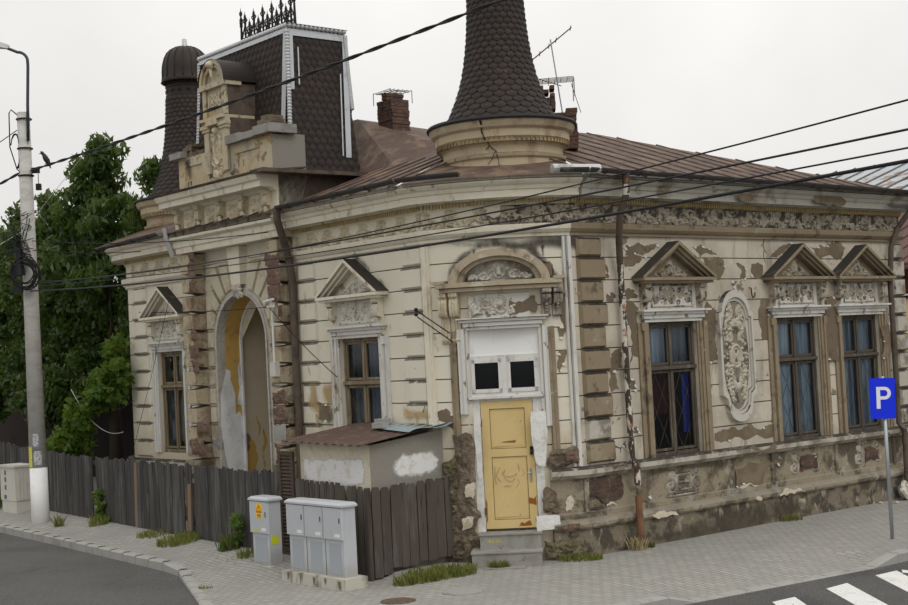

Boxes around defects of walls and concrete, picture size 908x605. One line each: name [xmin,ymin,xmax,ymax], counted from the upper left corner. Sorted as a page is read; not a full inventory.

flaking render [624,243,660,269]
flaking render [693,242,793,289]
leakage [310,385,333,425]
leakage [404,409,428,424]
flaking render [547,446,584,469]
flaking render [437,409,482,563]
leakage [678,503,802,539]